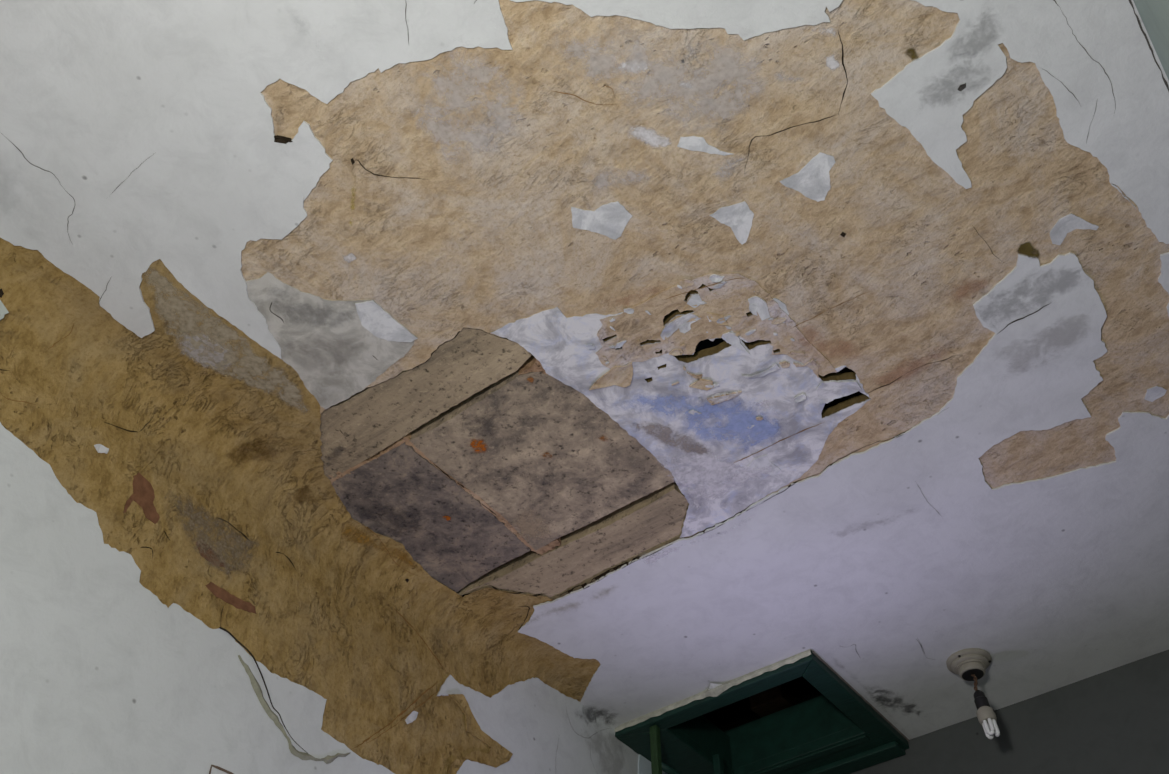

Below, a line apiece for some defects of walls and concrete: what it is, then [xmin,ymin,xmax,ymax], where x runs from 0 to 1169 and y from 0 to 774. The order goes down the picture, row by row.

crack [0,132,75,245]
peeling [241,0,1169,496]
crack [1041,0,1116,143]
peeling [0,238,600,774]